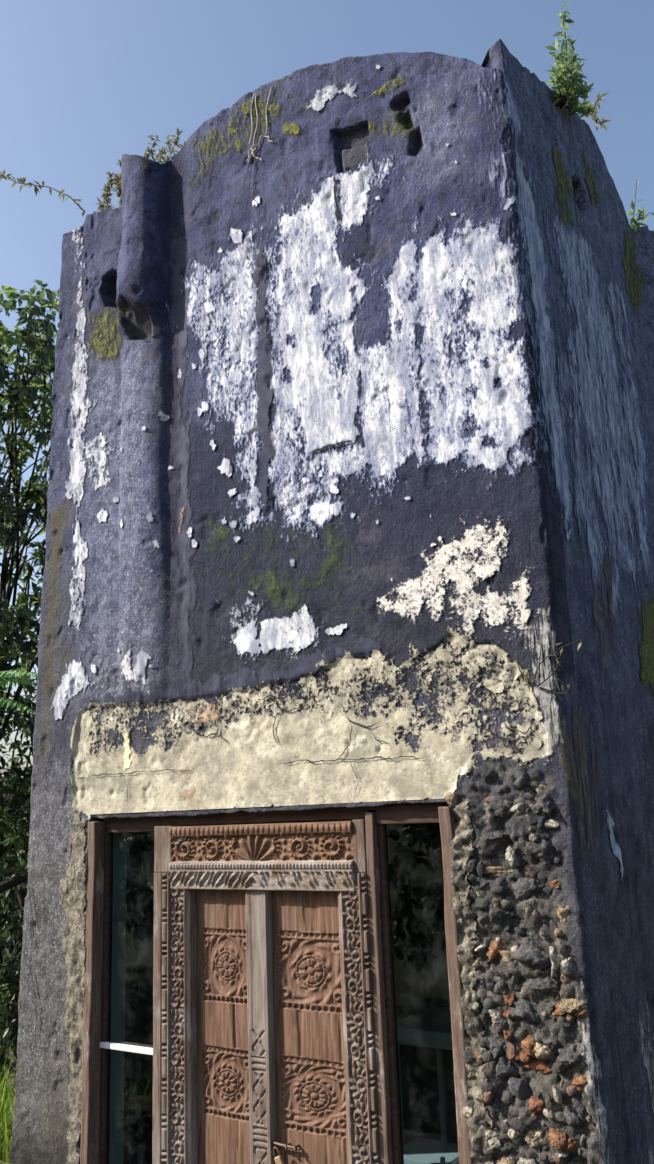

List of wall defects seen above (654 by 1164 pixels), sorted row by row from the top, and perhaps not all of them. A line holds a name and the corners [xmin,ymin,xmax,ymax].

peeling [63,227,122,631]
damp [86,236,381,708]
peeling [119,56,584,557]
crack [78,769,193,799]
crack [189,722,227,742]
spalling [50,515,554,1164]
crack [262,695,430,791]